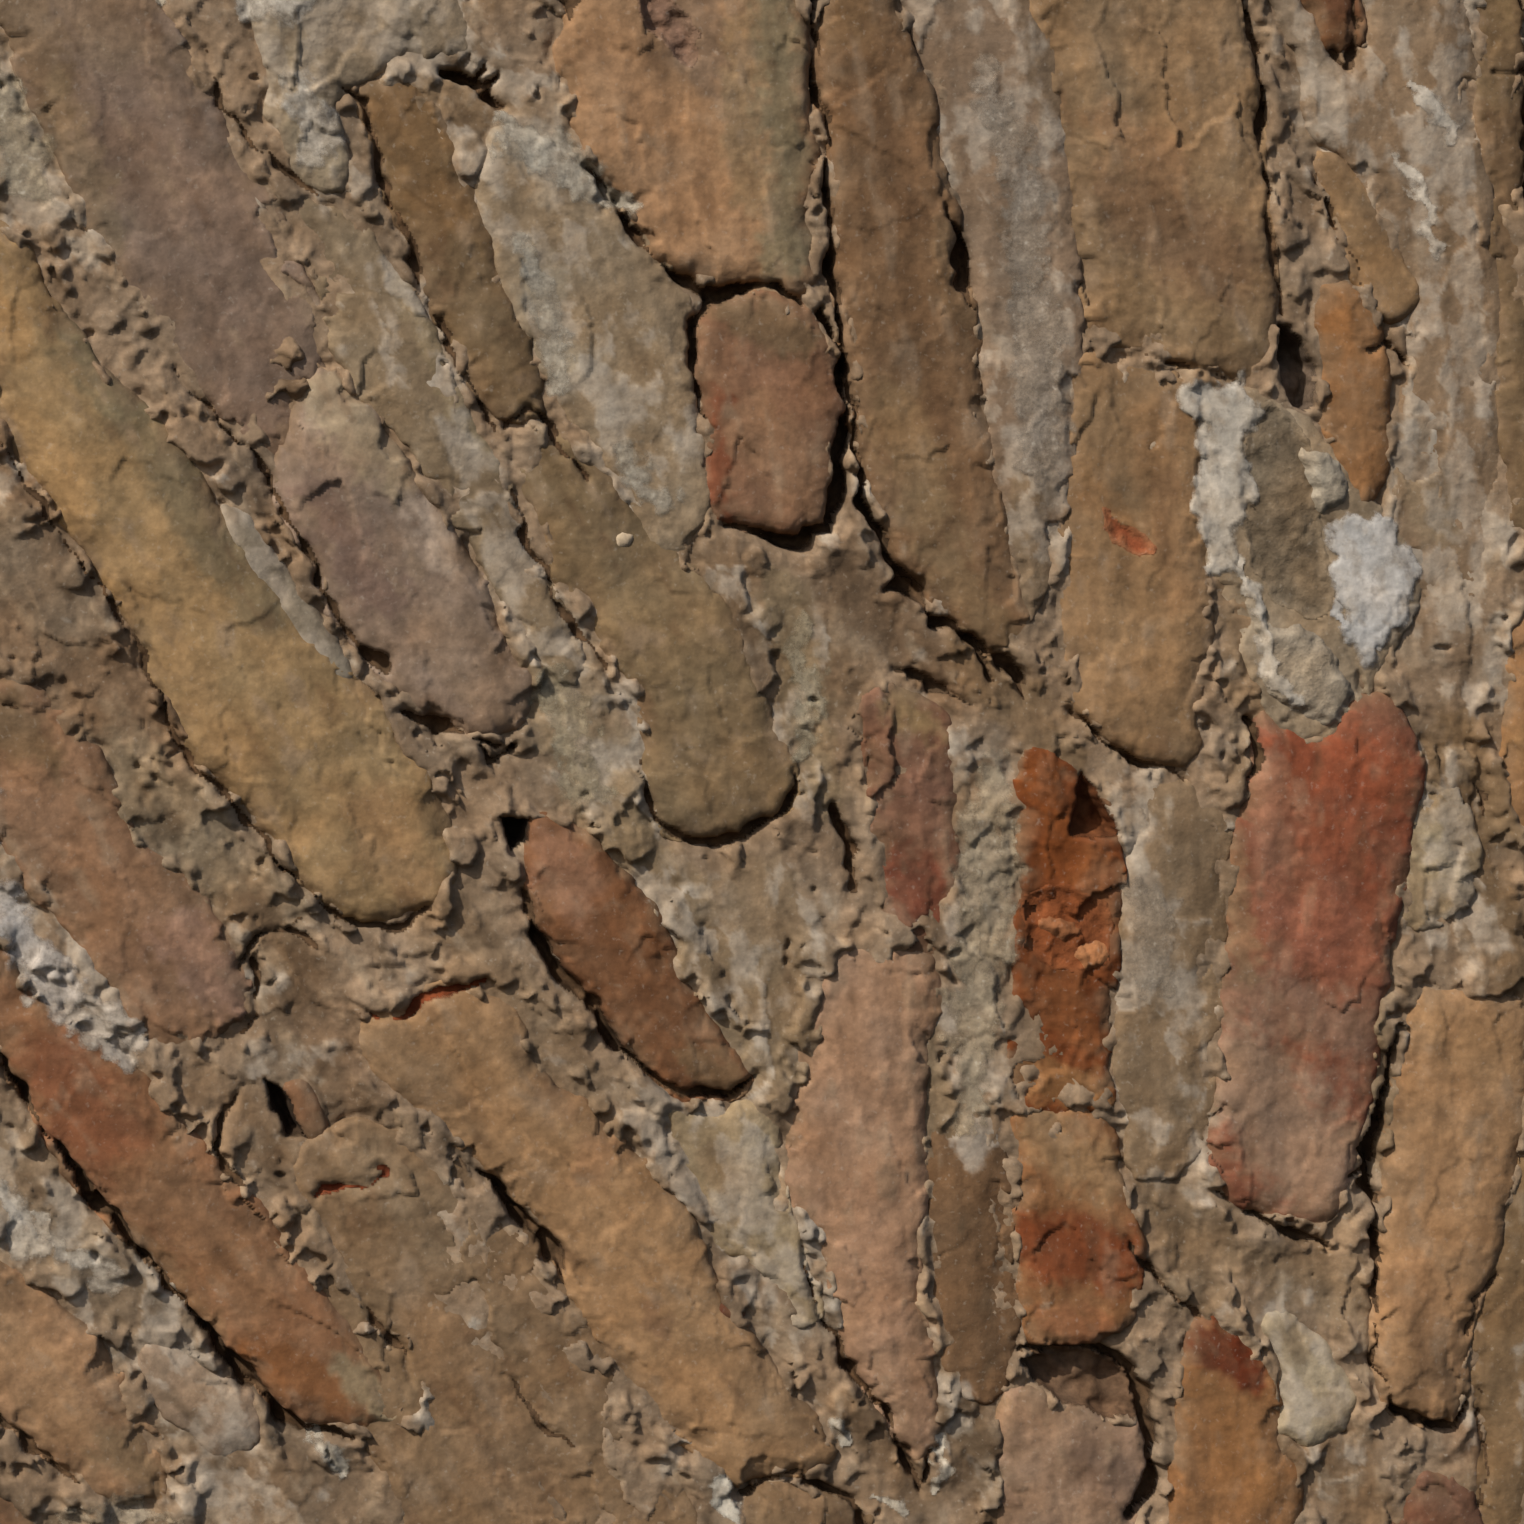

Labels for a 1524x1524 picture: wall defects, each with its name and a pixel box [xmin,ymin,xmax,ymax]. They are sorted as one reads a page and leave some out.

damp [1177,370,1305,706]
damp [1325,513,1422,667]